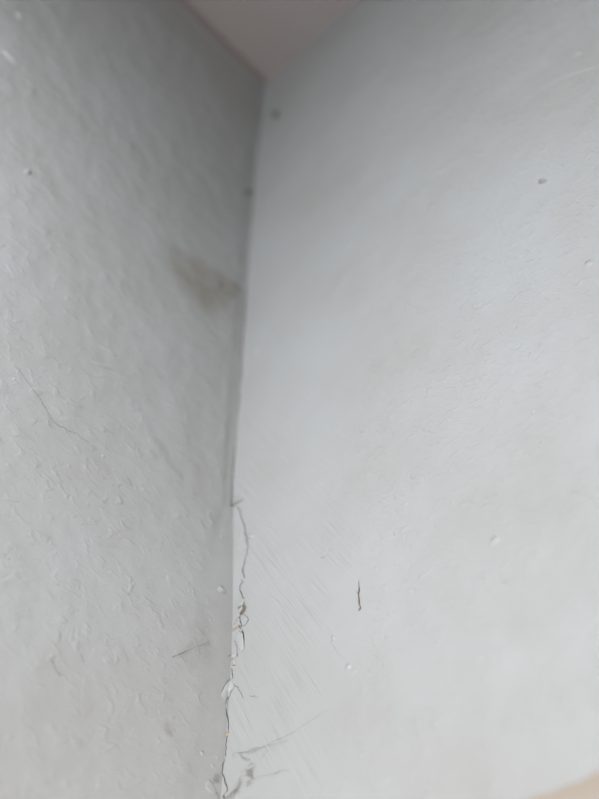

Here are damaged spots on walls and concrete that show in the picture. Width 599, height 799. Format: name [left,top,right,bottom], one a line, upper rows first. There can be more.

crack [230,448,248,598]
crack [212,617,256,799]